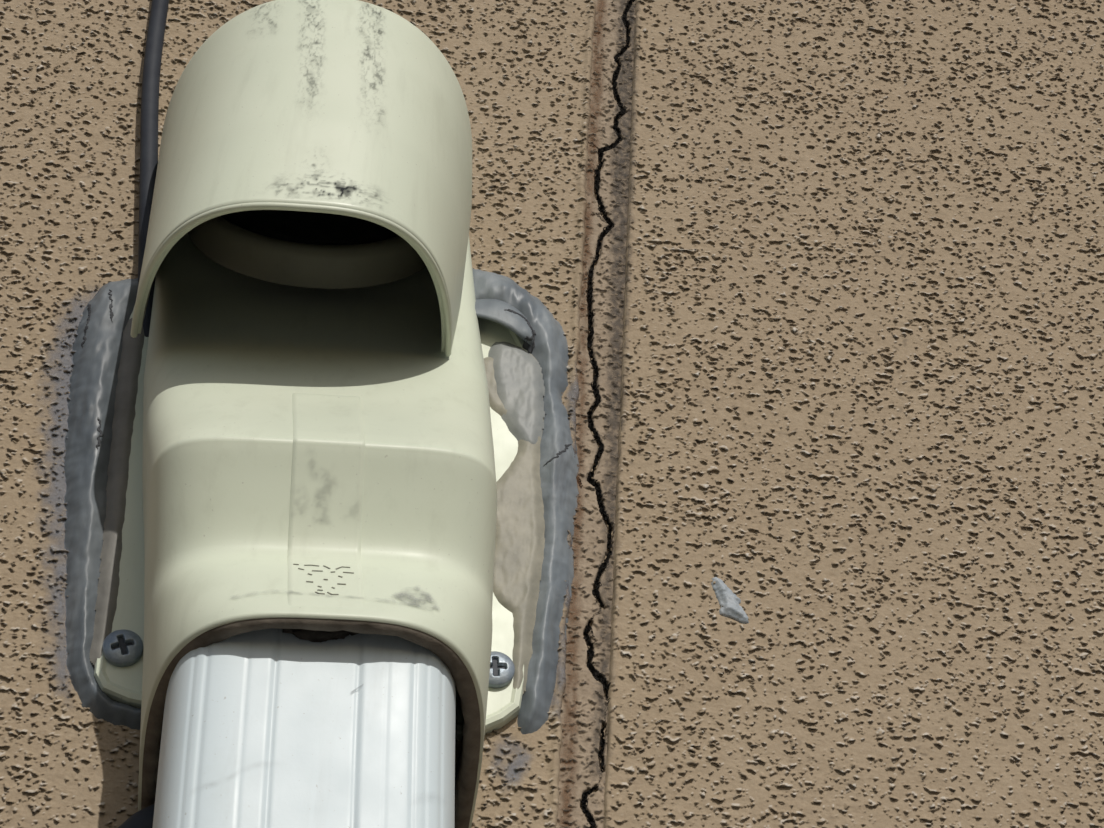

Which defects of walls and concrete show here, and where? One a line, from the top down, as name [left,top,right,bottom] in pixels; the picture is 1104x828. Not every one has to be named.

crack [581,0,635,828]